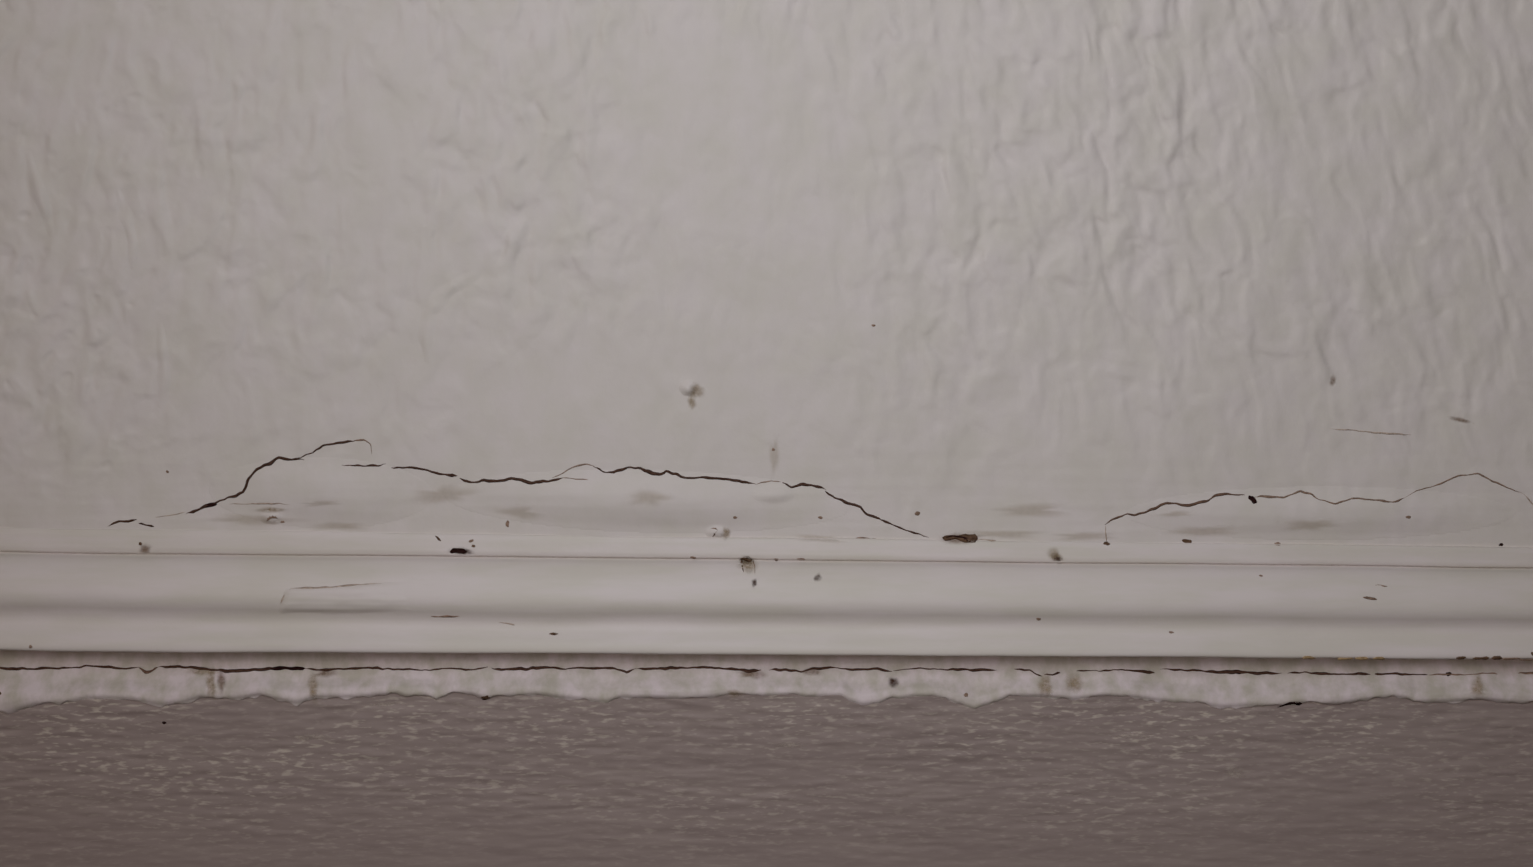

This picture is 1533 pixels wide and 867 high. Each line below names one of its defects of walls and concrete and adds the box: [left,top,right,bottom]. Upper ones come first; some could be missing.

crack [109,439,926,537]
crack [1105,473,1533,542]